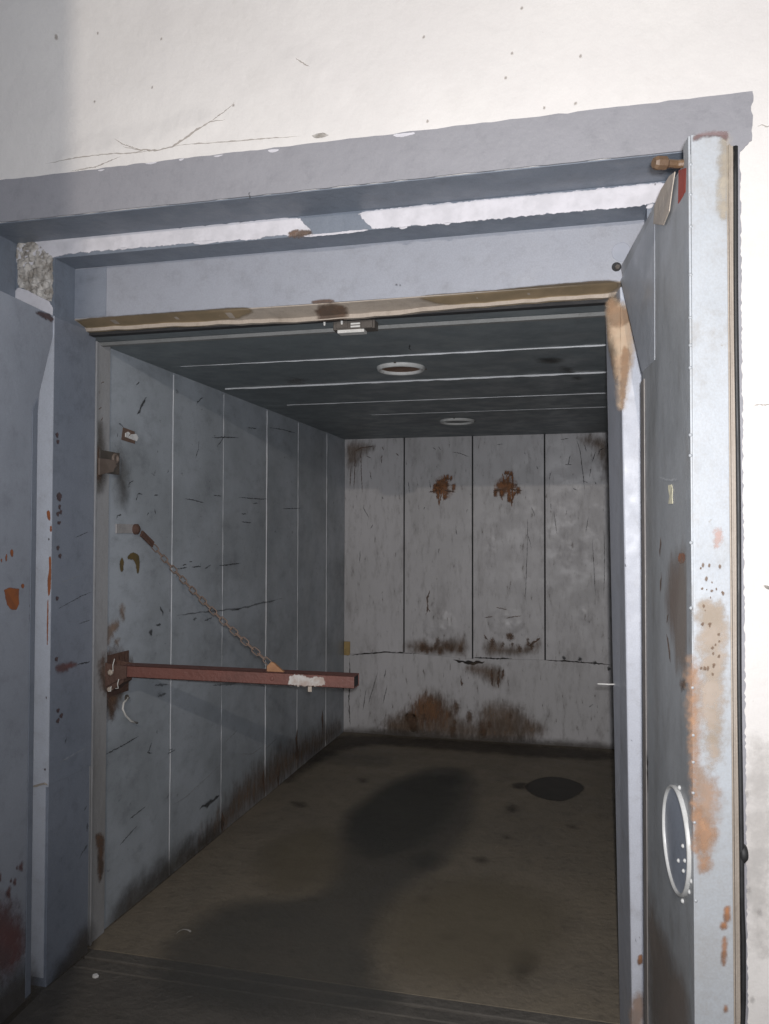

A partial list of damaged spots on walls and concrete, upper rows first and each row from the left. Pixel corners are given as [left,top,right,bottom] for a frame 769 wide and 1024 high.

crack [46,104,295,171]
peeling [15,182,665,315]
rust [430,475,455,504]
rust [493,471,522,506]
rust [4,584,24,610]
rust [409,638,464,654]
rust [484,633,540,654]
rust [389,693,542,741]
rust [721,907,730,966]